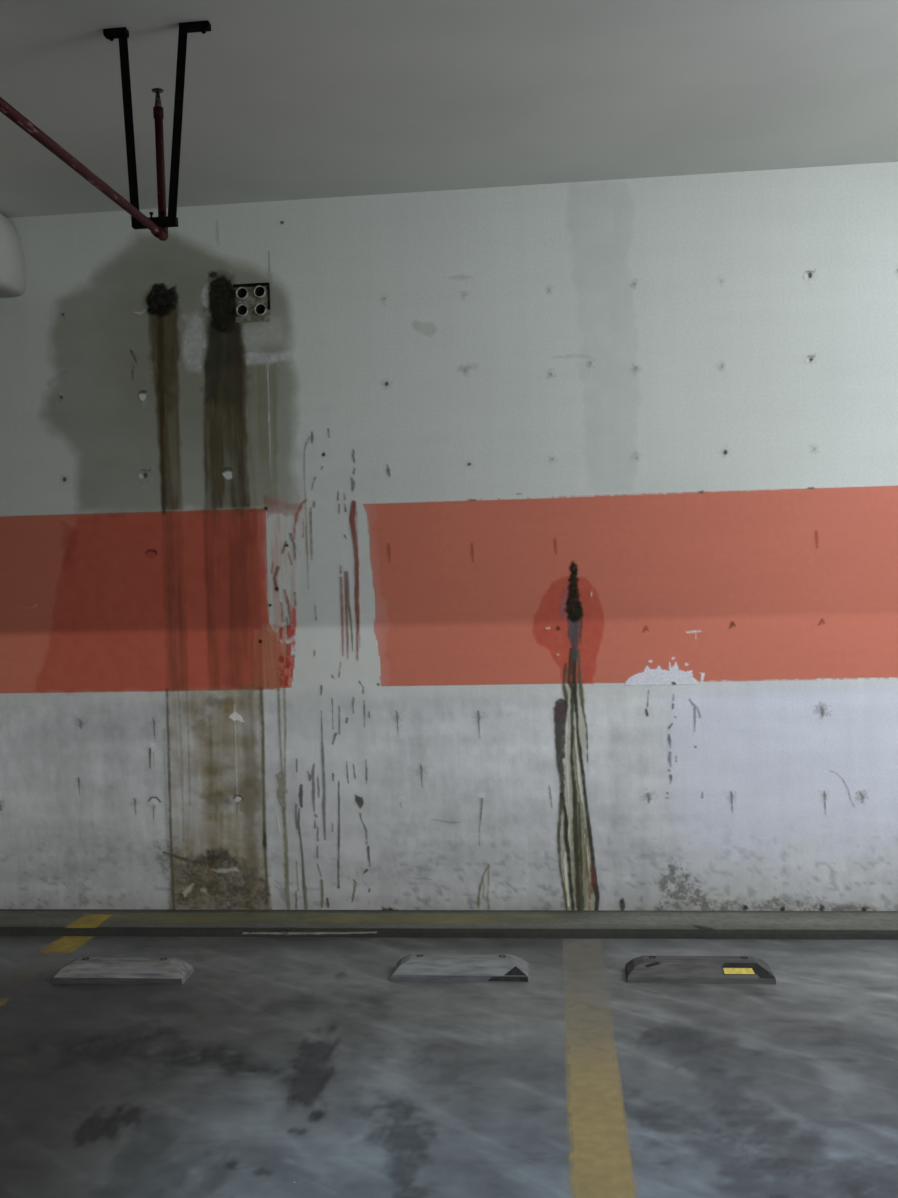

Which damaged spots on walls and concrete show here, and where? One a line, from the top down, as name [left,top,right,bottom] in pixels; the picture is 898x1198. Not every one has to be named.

damp [147,284,180,513]
damp [205,272,249,508]
rust [166,687,268,910]
peeling [625,657,705,799]